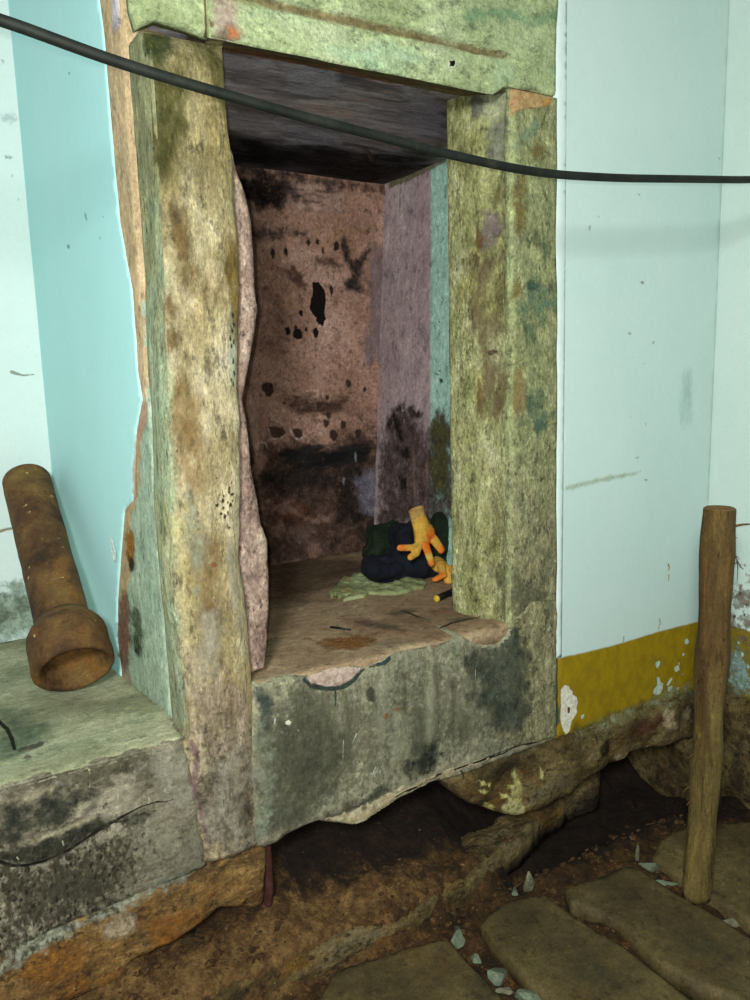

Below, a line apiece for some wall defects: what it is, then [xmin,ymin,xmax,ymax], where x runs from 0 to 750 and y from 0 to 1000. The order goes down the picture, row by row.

water stain [413,411,450,502]
water stain [464,572,546,735]
peeling [560,639,690,734]
peeling [728,641,750,693]
crack [0,800,171,867]
water stain [0,742,242,865]
water stain [480,771,525,815]